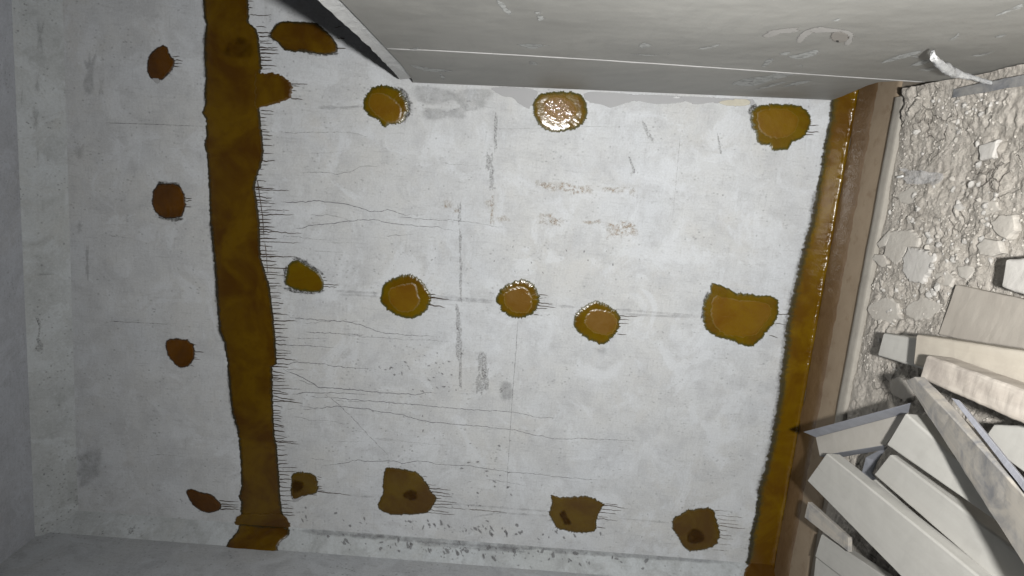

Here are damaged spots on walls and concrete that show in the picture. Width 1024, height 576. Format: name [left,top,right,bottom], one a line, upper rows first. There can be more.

crack [287,200,465,237]
crack [285,317,611,484]